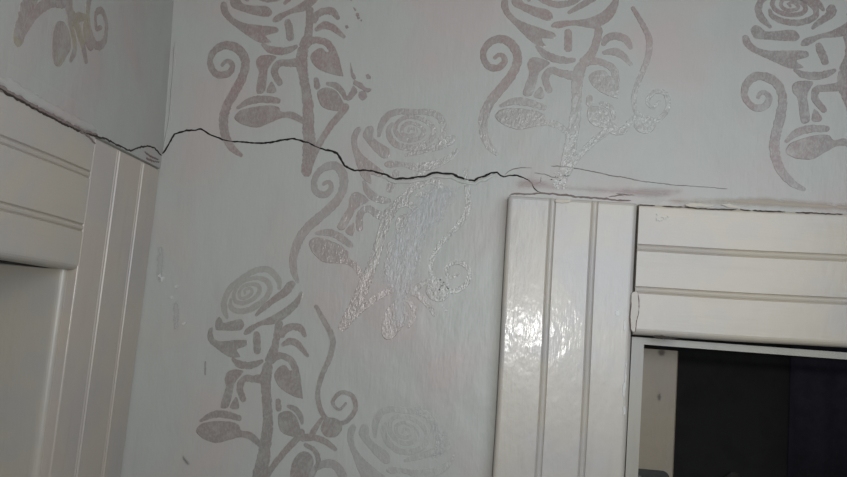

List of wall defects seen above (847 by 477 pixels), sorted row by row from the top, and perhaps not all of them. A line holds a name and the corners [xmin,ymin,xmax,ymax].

crack [0,85,842,215]